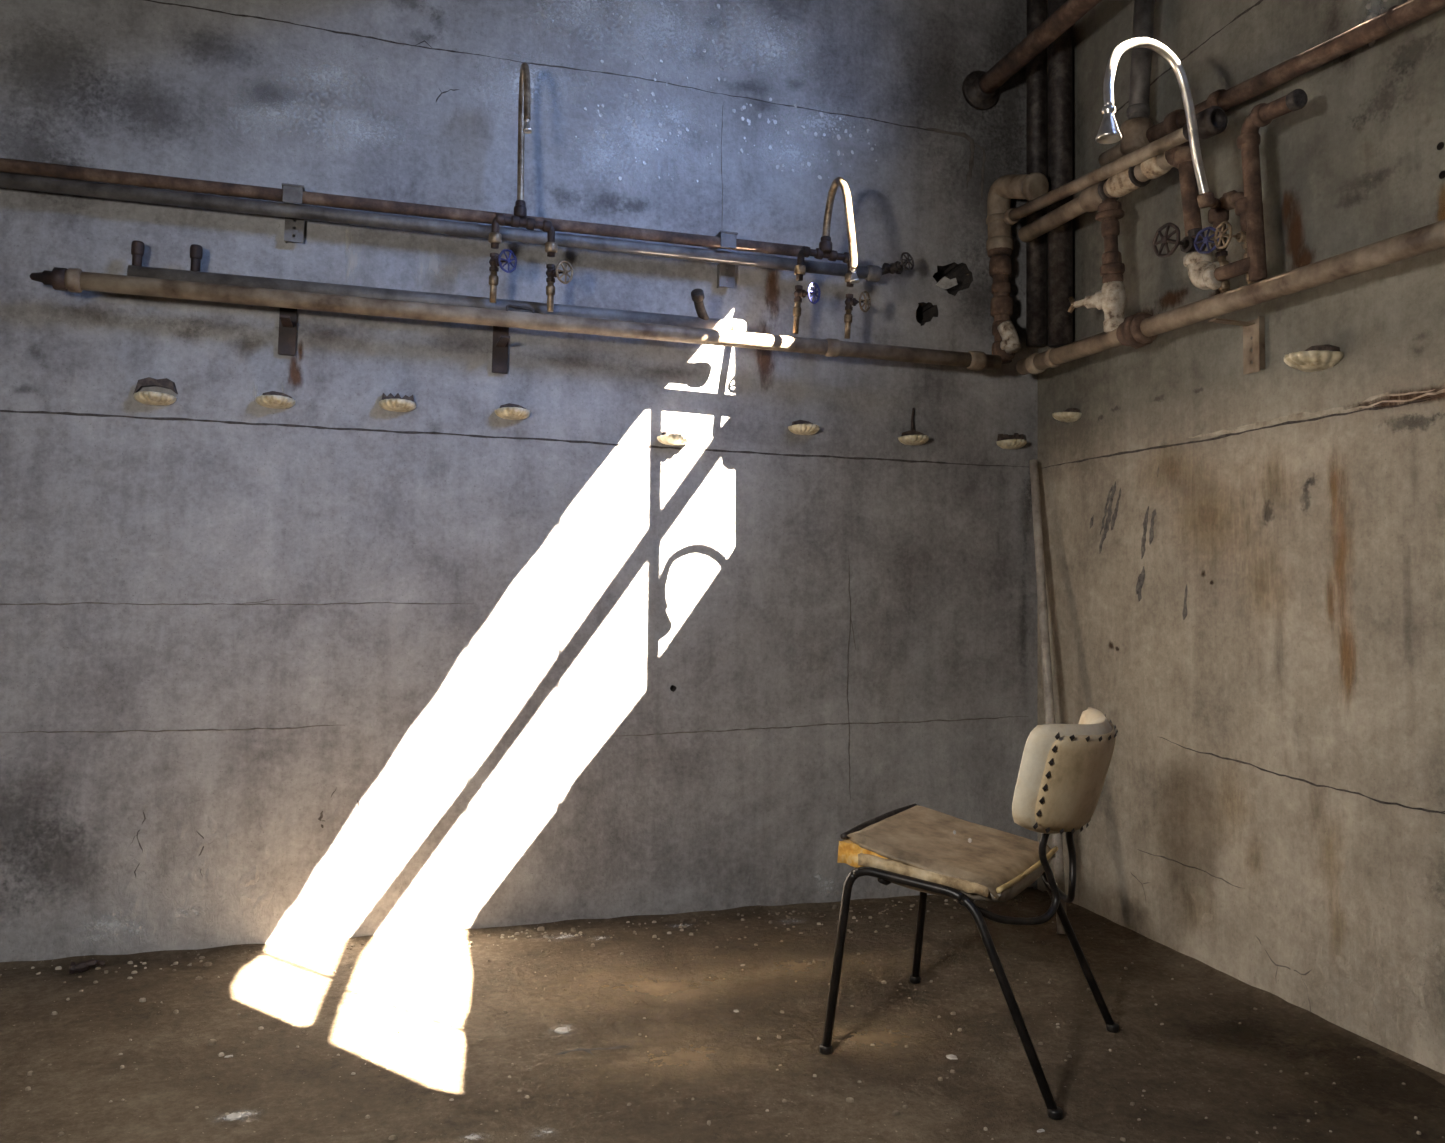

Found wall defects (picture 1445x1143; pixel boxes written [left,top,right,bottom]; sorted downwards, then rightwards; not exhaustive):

spalling [916,262,973,326]
crack [0,395,1445,469]
crack [1160,737,1445,814]